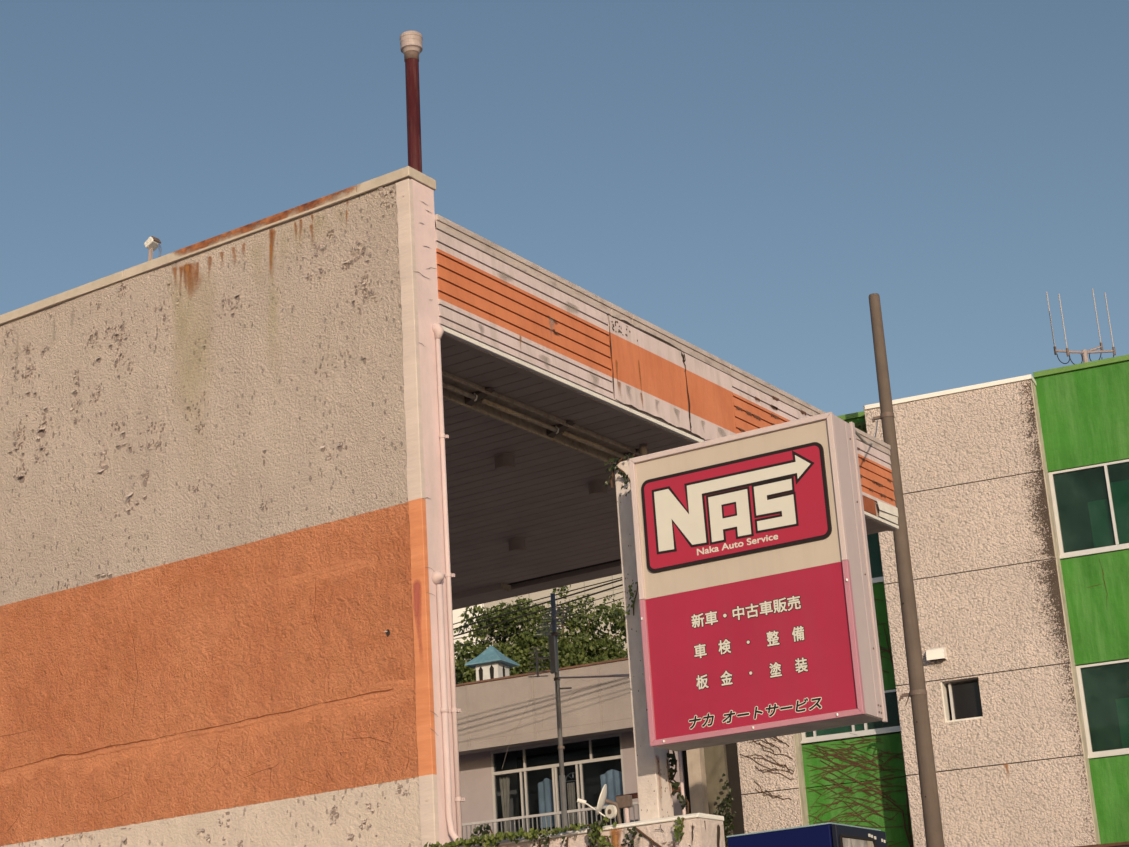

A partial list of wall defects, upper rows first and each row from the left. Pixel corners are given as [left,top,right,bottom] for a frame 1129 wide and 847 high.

corrosion [173,186,355,279]
peeling [306,229,378,315]
peeling [87,283,179,380]
peeling [5,327,54,483]
peeling [70,369,102,425]
peeling [98,408,166,472]
peeling [306,441,347,481]
crack [608,313,705,440]
crack [3,619,417,802]
peeling [197,811,243,847]
peeling [347,783,407,842]